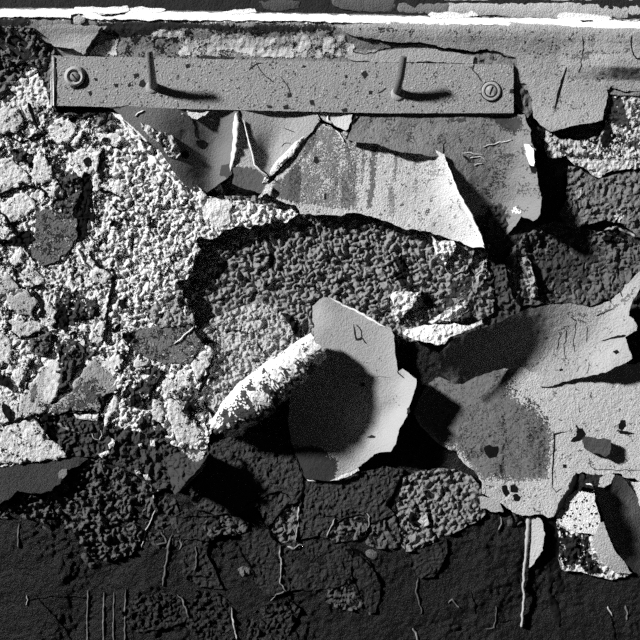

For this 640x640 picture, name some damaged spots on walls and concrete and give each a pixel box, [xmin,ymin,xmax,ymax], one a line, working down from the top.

crack [353,35,514,81]
spalling [0,321,212,561]
spalling [0,22,640,481]
peeling [365,94,640,580]
spalling [119,590,300,640]